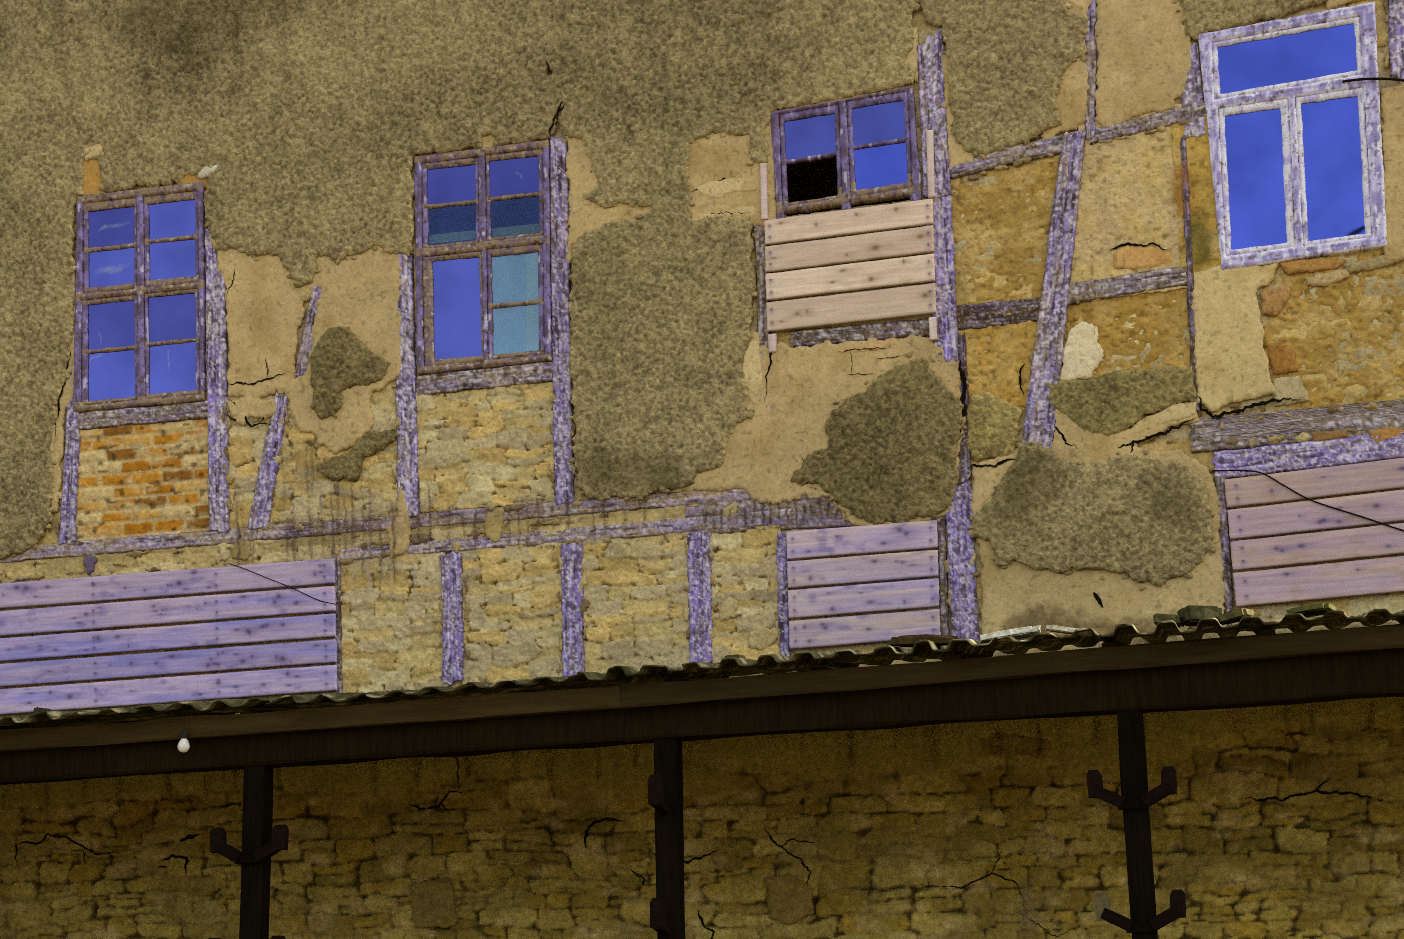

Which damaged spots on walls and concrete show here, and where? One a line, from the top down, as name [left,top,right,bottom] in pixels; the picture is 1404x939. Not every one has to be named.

flaking render [1041,0,1192,140]
flaking render [565,136,653,264]
flaking render [688,122,777,227]
flaking render [209,234,402,454]
flaking render [956,82,1404,640]
flaking render [672,330,962,526]
crack [1245,779,1389,803]
crack [14,833,119,865]
crack [158,834,200,877]
crack [698,910,715,939]
crack [765,831,814,883]
crack [916,850,1079,937]